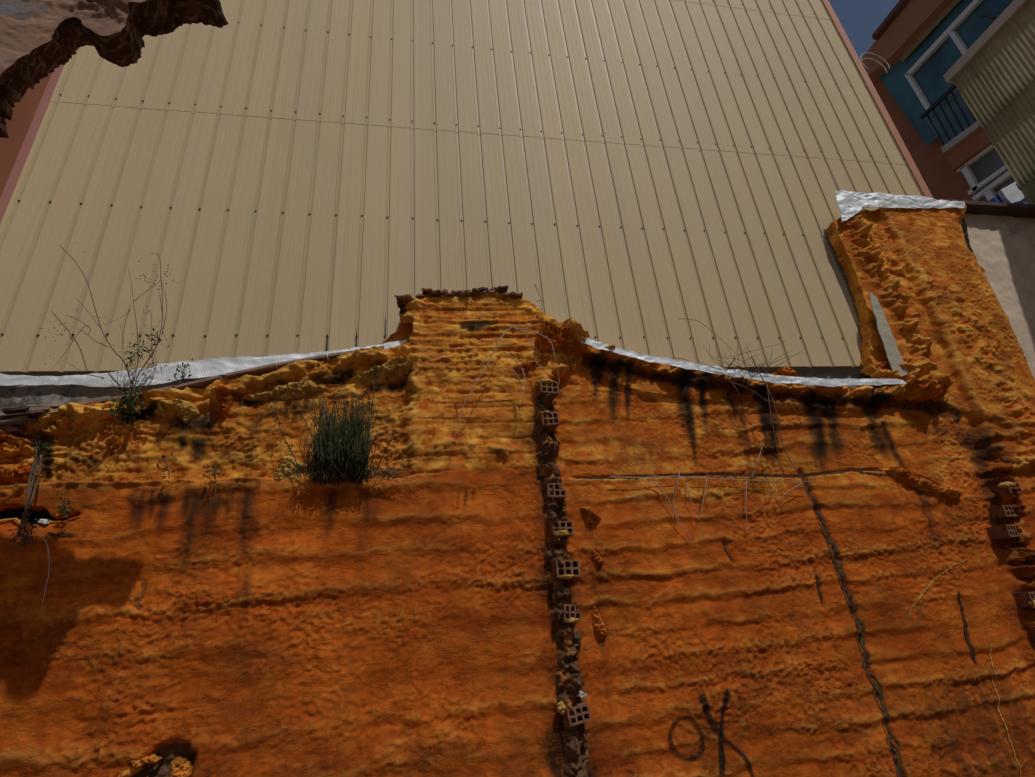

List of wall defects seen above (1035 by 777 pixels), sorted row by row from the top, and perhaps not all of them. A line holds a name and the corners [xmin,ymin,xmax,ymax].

spalling [0,81,23,138]
leakage [584,353,962,461]
leakage [131,490,170,520]
leakage [183,489,252,549]
crack [574,468,934,777]
crack [958,591,977,665]
spalling [118,743,196,777]